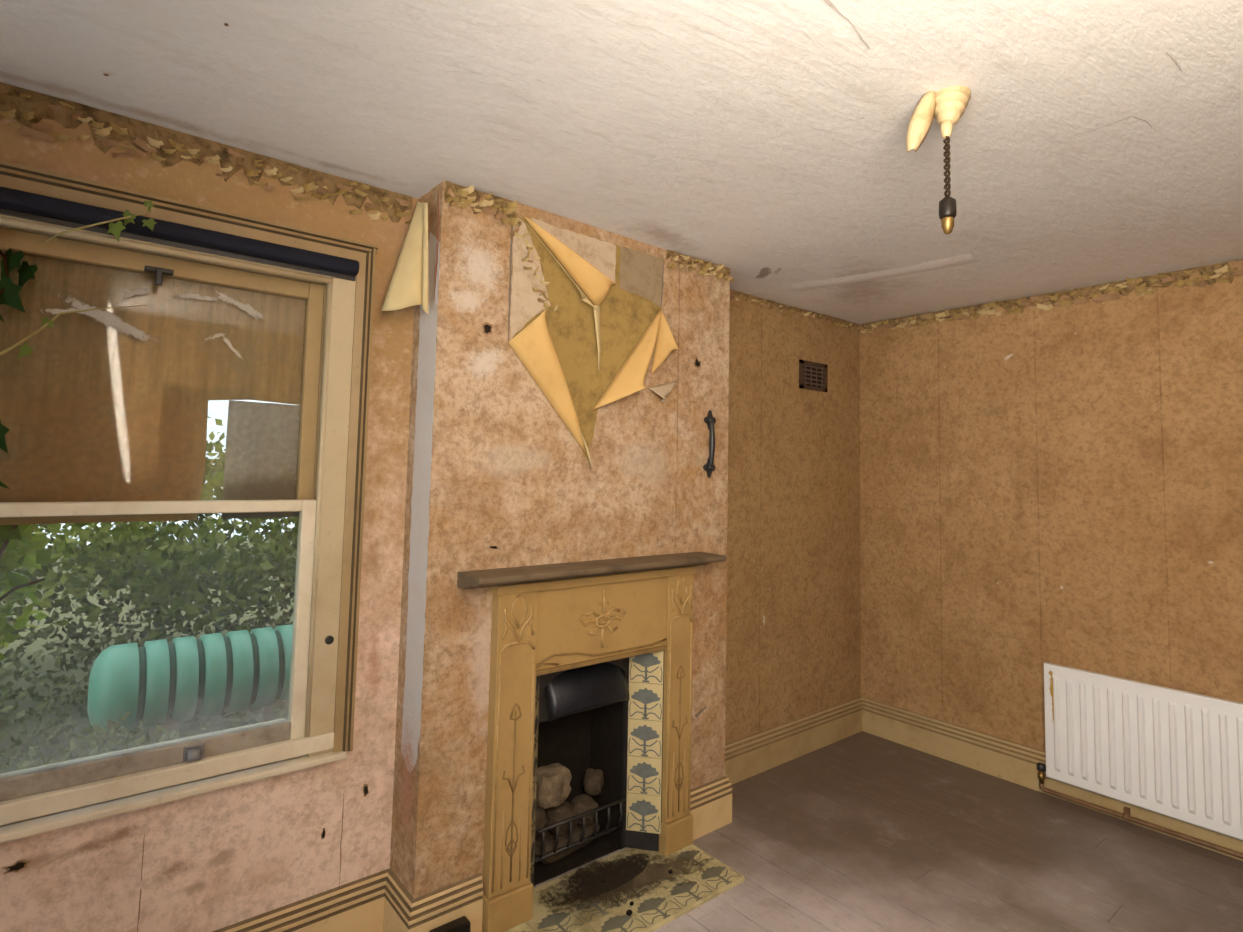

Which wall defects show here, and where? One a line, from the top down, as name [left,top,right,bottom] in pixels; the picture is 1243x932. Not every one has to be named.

crack [824,0,870,49]
peeling [0,82,412,224]
flaking render [444,181,661,461]